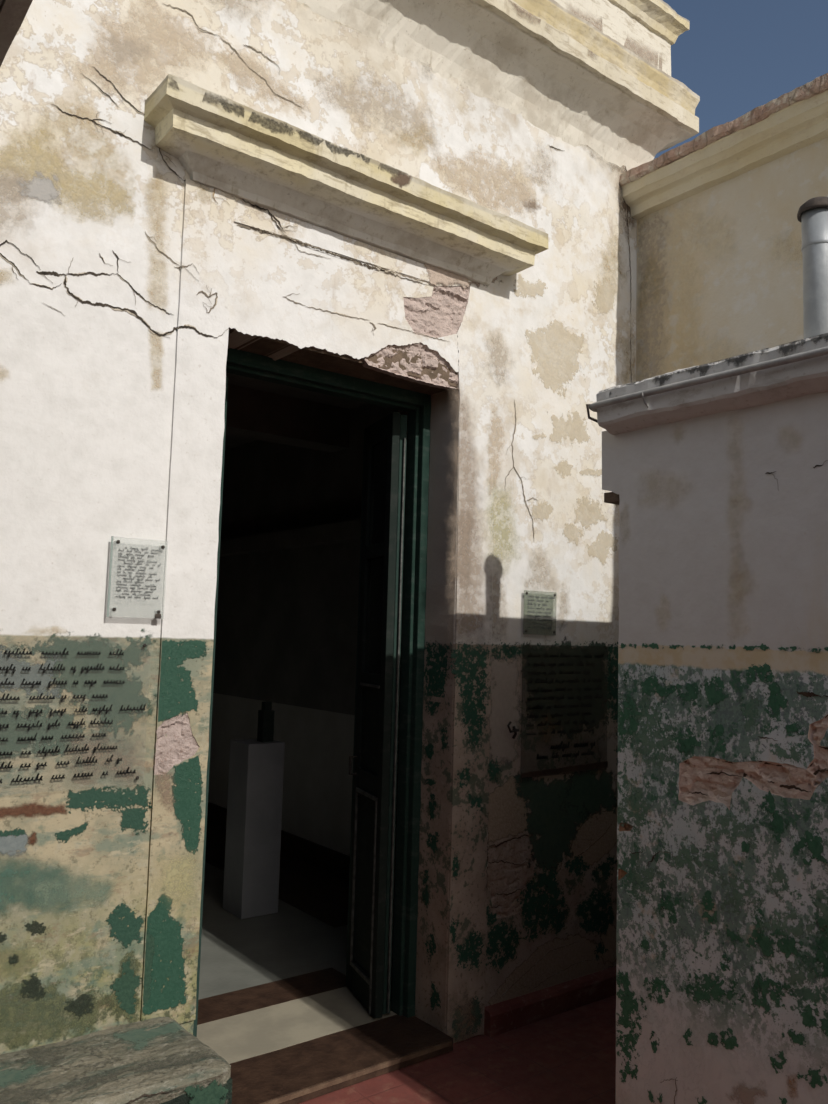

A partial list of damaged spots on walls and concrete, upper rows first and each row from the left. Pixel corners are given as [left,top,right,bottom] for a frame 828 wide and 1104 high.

crack [165,4,302,109]
crack [52,66,429,283]
crack [0,232,229,338]
spalling [362,263,497,391]
crack [505,400,538,537]
peeling [0,629,217,1104]
peeling [424,637,828,1088]
peeling [184,1079,232,1104]